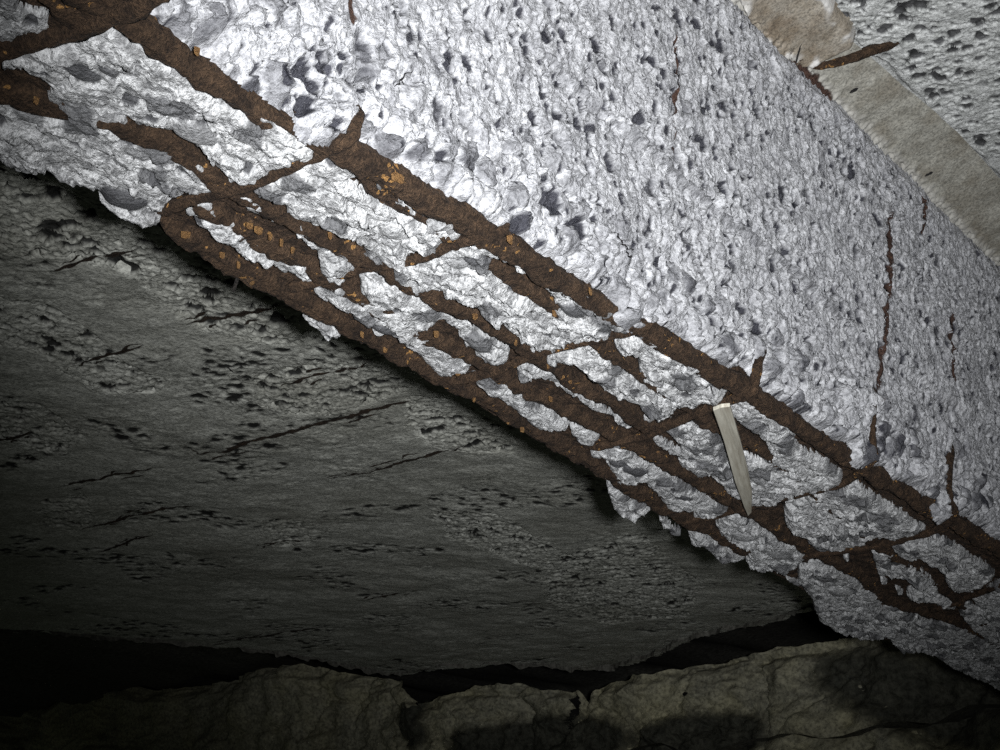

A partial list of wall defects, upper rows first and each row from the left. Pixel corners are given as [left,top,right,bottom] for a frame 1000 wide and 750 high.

spalling [0,0,51,42]
corrosion [38,0,135,30]
corrosion [348,0,357,25]
corrosion [671,33,680,150]
corrosion [784,50,832,101]
spalling [813,41,900,70]
spalling [0,14,333,229]
corrosion [49,249,145,272]
corrosion [187,304,281,328]
corrosion [876,206,894,393]
corrosion [191,398,425,460]
spalling [158,141,1000,690]